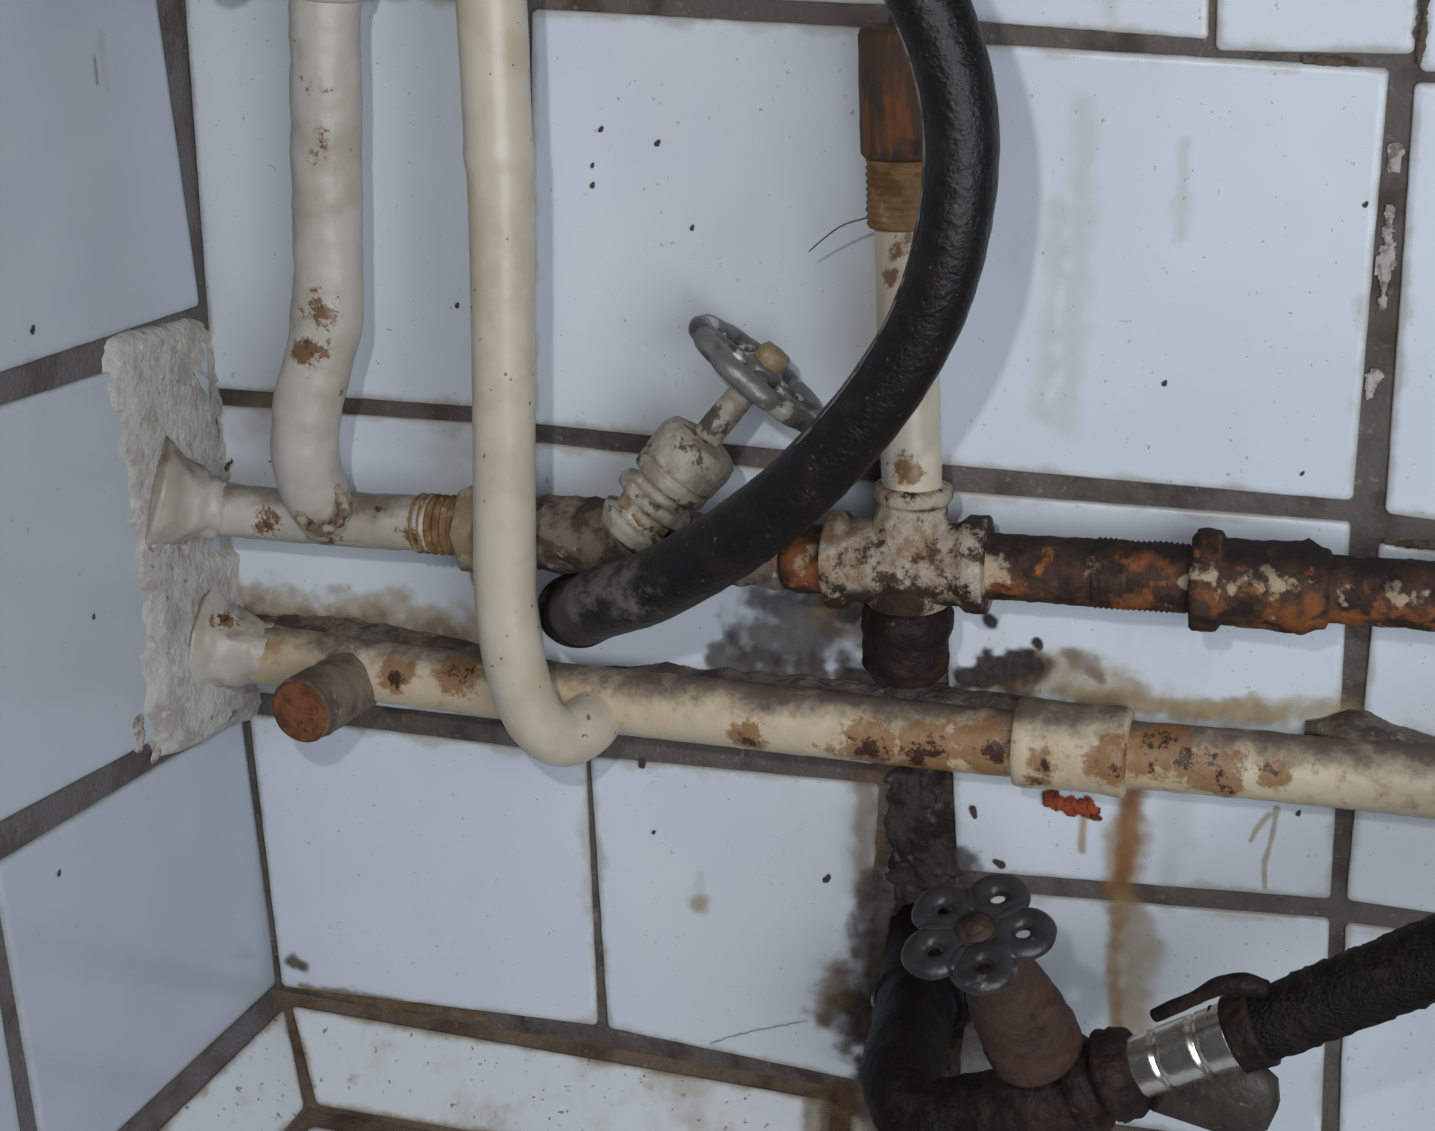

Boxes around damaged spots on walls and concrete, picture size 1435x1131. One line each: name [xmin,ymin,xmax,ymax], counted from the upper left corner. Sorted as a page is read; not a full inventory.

water stain [1387,142,1405,173]
water stain [1374,205,1397,309]
water stain [1365,368,1384,400]
water stain [955,657,1052,693]
corrosion [1116,791,1139,883]
corrosion [821,1083,878,1131]